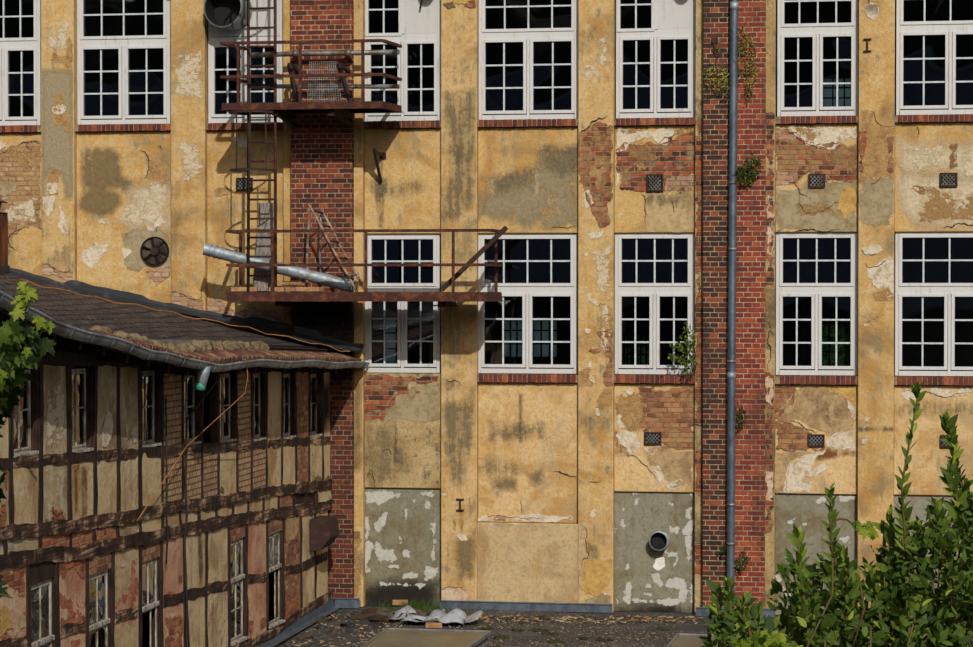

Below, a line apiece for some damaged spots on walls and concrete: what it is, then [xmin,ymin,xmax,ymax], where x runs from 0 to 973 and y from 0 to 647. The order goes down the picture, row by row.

flaking render [0,139,68,255]
damp [42,70,131,214]
flaking render [95,159,171,286]
damp [445,92,474,217]
damp [483,148,577,227]
peeling [765,110,973,285]
flaking render [171,289,284,323]
flaking render [478,121,703,607]
damp [486,462,515,489]
damp [493,416,539,438]
peeling [354,490,438,598]
flaking render [440,586,469,601]